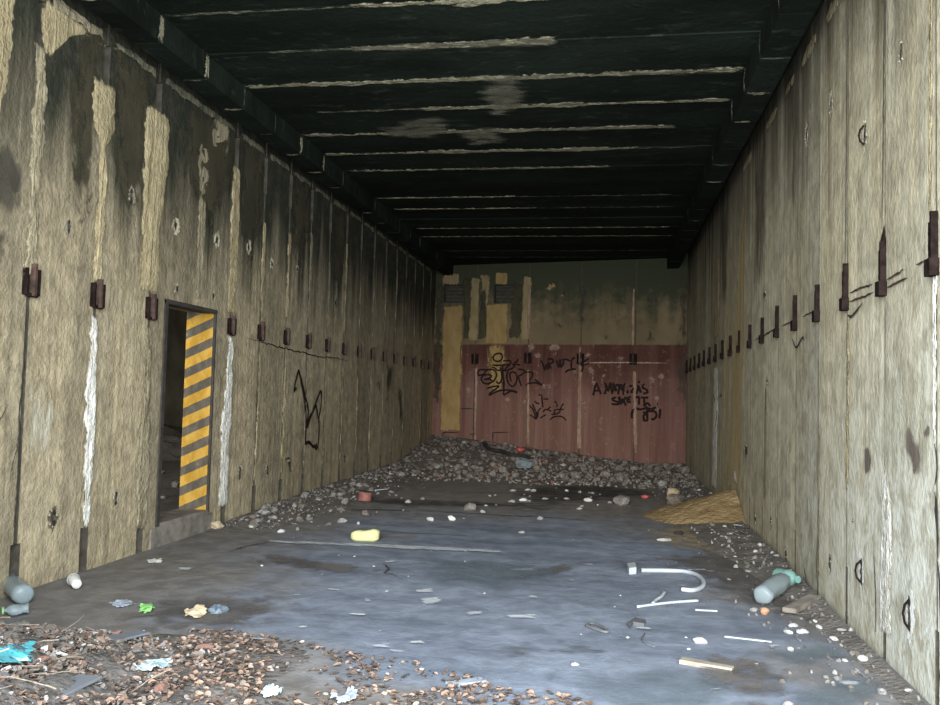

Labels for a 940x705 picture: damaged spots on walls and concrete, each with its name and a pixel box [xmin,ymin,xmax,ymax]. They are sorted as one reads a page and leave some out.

leakage [83,316,98,527]